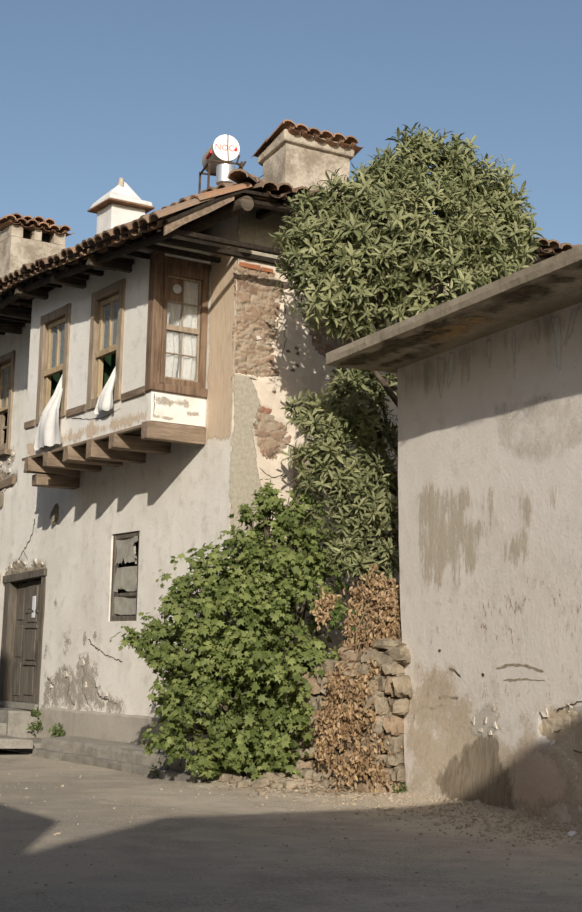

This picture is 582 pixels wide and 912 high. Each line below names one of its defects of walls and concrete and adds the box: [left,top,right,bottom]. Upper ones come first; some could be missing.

flaking render [231,264,300,380]
flaking render [253,406,316,491]
peeling [42,655,122,713]
leakage [437,731,513,810]
flaking render [539,704,582,791]